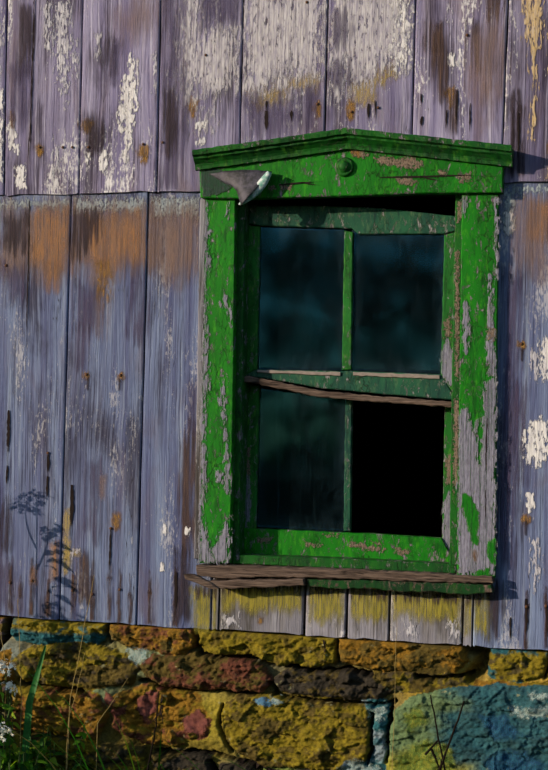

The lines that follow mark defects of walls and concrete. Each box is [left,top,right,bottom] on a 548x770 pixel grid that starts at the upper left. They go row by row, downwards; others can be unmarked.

peeling [520,0,548,141]
peeling [347,150,424,186]
rust [4,207,191,300]
peeling [0,0,293,565]
peeling [440,174,548,576]
peeling [349,539,411,556]